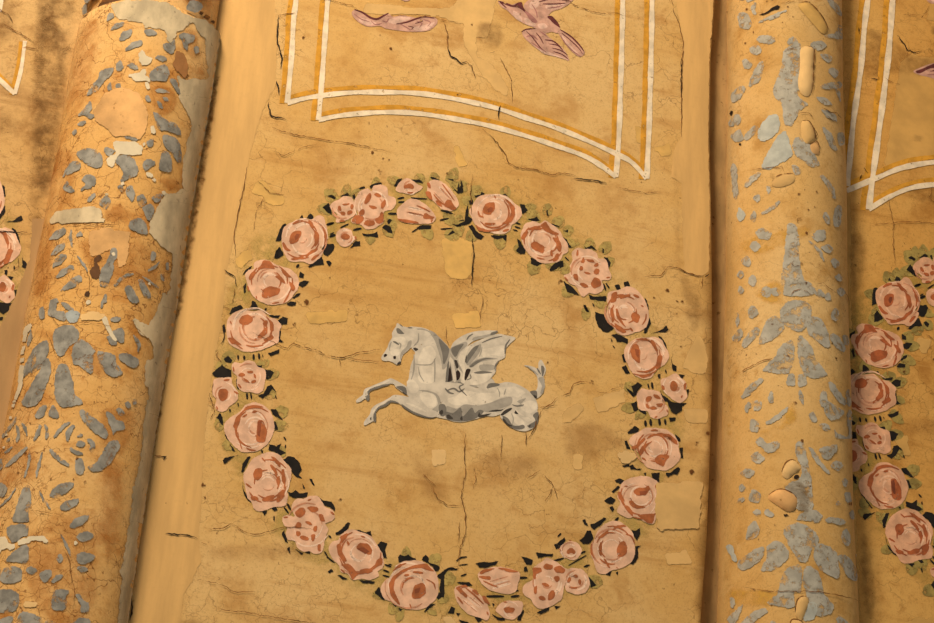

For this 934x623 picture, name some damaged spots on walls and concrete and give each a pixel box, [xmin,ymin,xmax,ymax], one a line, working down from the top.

flaking render [50,206,105,224]
crack [216,168,283,361]
crack [471,236,483,318]
crack [651,266,709,281]
peeling [80,291,117,342]
flaking render [106,0,220,623]
peeling [9,323,32,419]
crack [253,332,377,366]
crack [526,381,614,438]
crack [424,434,476,564]
flaking render [0,536,48,552]
crack [166,523,311,544]